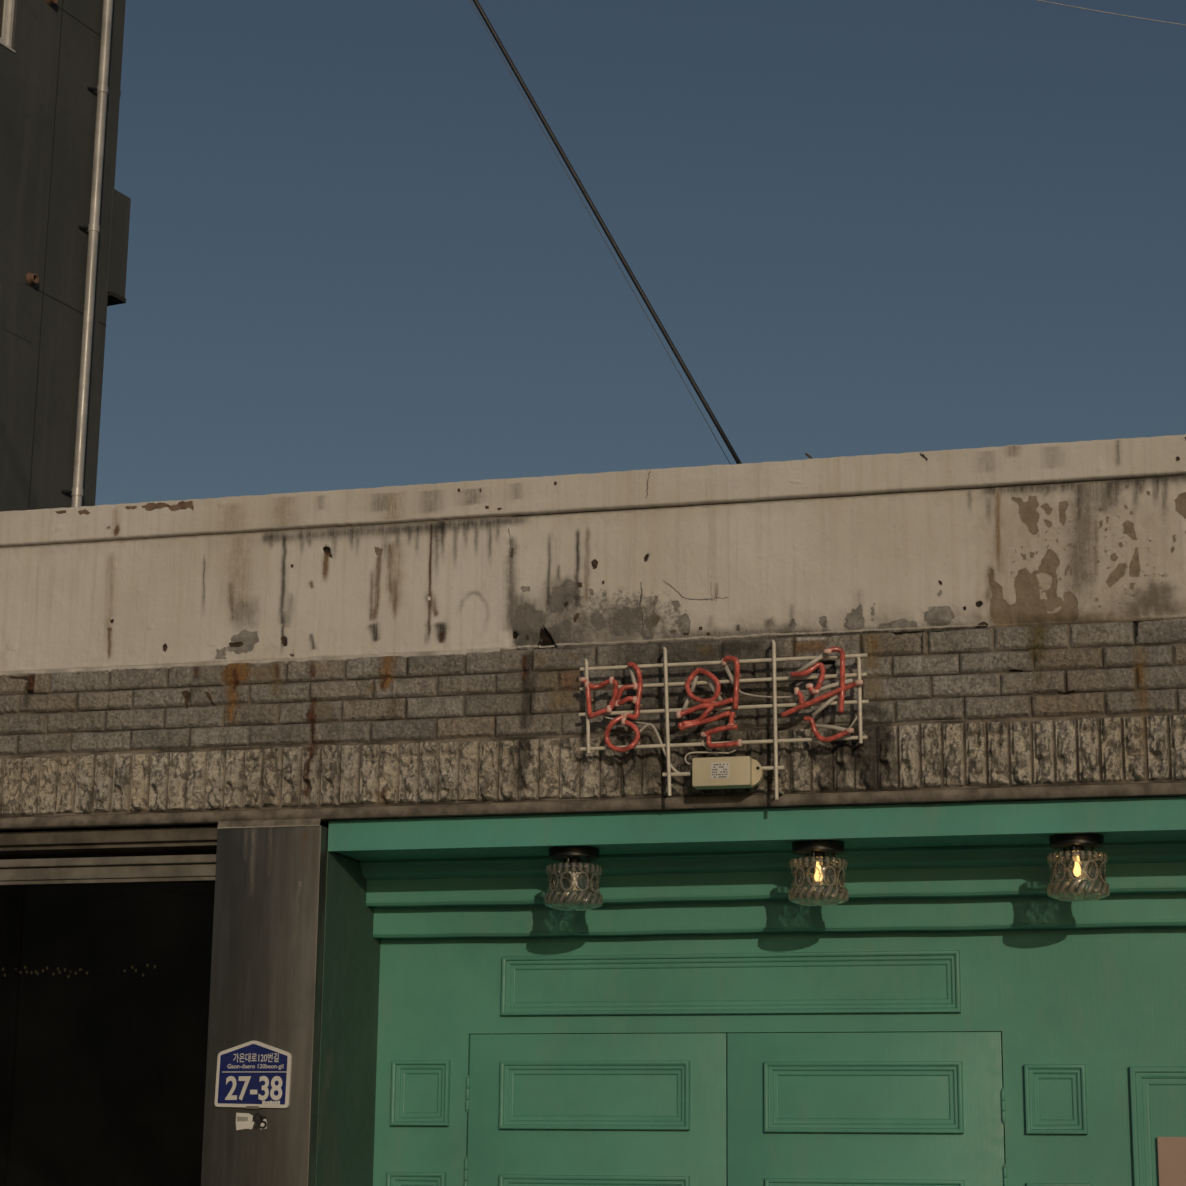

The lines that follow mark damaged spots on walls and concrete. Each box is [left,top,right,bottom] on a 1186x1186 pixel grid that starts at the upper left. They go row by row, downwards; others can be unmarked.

peeling [125,501,194,511]
peeling [1171,492,1186,553]
peeling [974,496,1167,629]
crack [9,674,35,695]
rust [224,663,249,721]
damp [507,532,955,791]